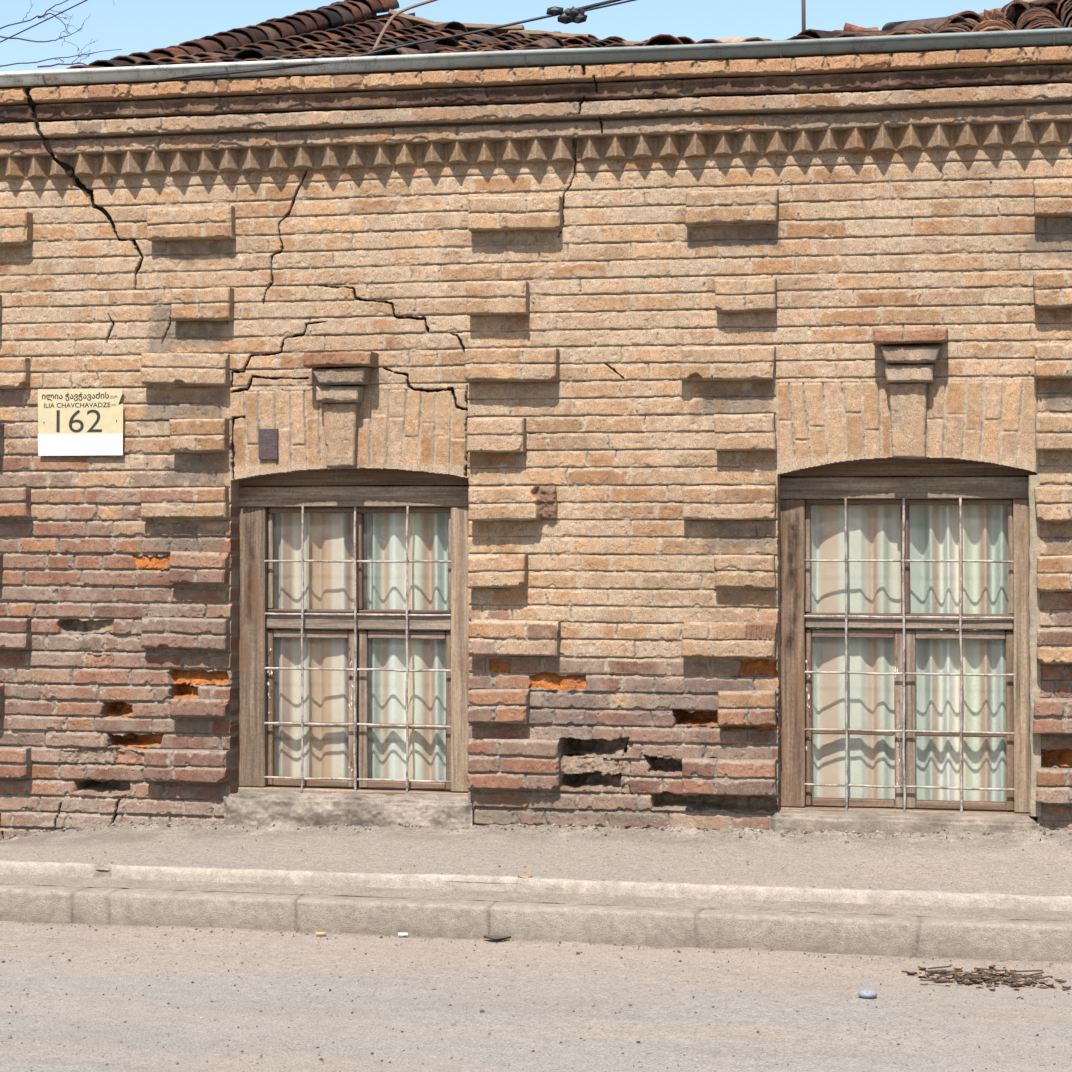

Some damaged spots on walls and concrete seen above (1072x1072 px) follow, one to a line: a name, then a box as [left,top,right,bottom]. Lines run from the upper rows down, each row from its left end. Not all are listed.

crack [559,65,603,236]
crack [25,88,144,289]
crack [264,171,307,302]
crack [325,285,465,353]
crack [231,322,325,479]
crack [384,368,468,418]
spalling [103,702,133,718]
spalling [170,669,229,698]
spalling [676,709,779,730]
spalling [59,733,164,796]
spalling [561,737,633,795]
hole [1041,748,1072,768]